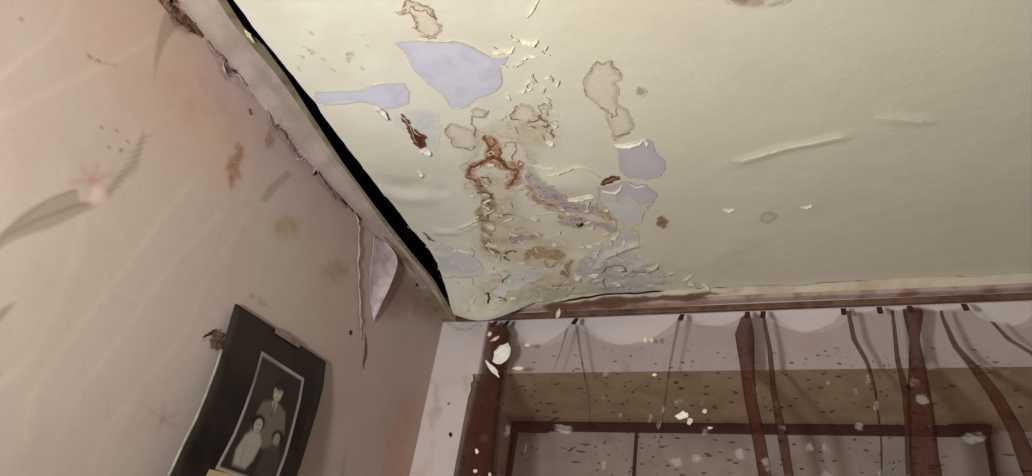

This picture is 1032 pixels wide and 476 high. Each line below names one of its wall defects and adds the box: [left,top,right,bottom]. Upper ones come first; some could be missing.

leakage [147,37,276,193]
leakage [397,0,443,39]
peeling [314,35,559,157]
leakage [583,61,634,142]
peeling [423,139,666,317]
leakage [445,102,717,332]